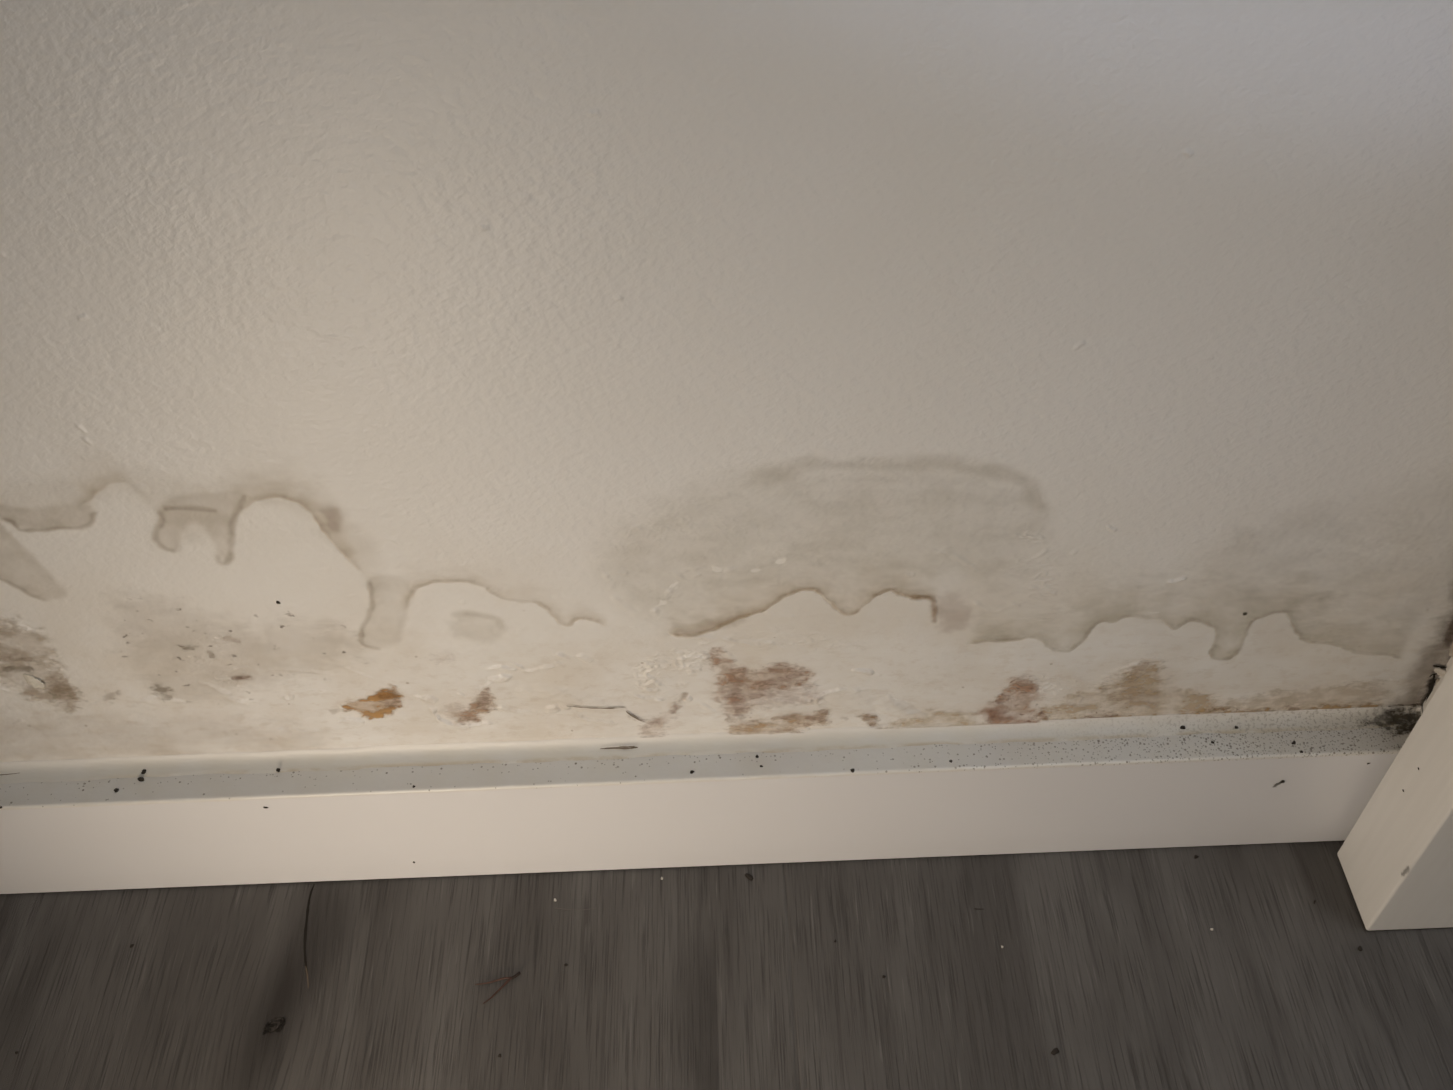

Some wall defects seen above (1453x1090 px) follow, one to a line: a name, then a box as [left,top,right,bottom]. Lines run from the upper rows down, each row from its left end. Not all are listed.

mould [1365,680,1436,736]